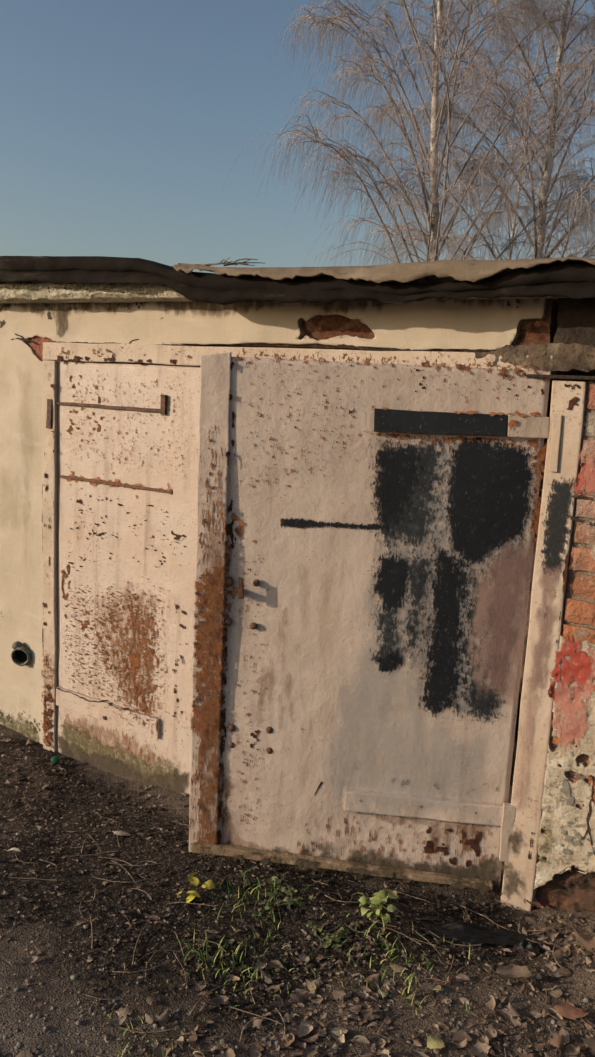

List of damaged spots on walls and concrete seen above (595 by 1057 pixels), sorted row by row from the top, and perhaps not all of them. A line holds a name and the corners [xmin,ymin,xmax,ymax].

spalling [20,334,56,361]
spalling [295,312,375,345]
spalling [516,317,550,345]
corrosion [41,347,552,859]
spalling [523,821,595,913]